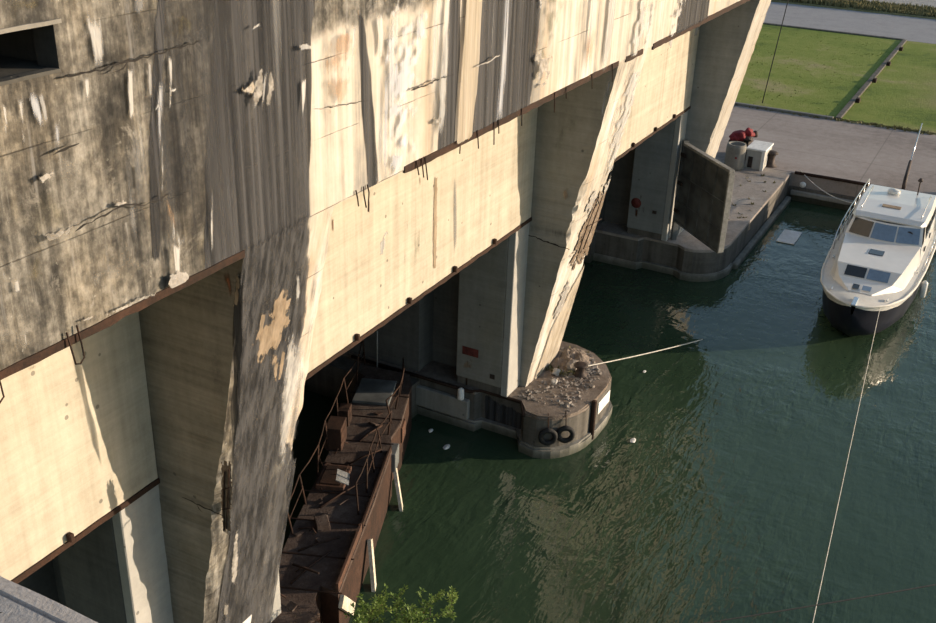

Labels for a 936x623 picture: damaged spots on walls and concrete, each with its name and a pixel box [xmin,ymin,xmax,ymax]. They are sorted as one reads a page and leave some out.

water stain [88,21,103,61]
crack [67,40,200,77]
water stain [20,96,47,121]
peeling [244,69,274,108]
crack [411,74,454,91]
water stain [137,0,218,260]
crack [75,194,168,232]
spalling [570,179,610,270]
water stain [168,246,189,288]
peeling [252,290,291,380]